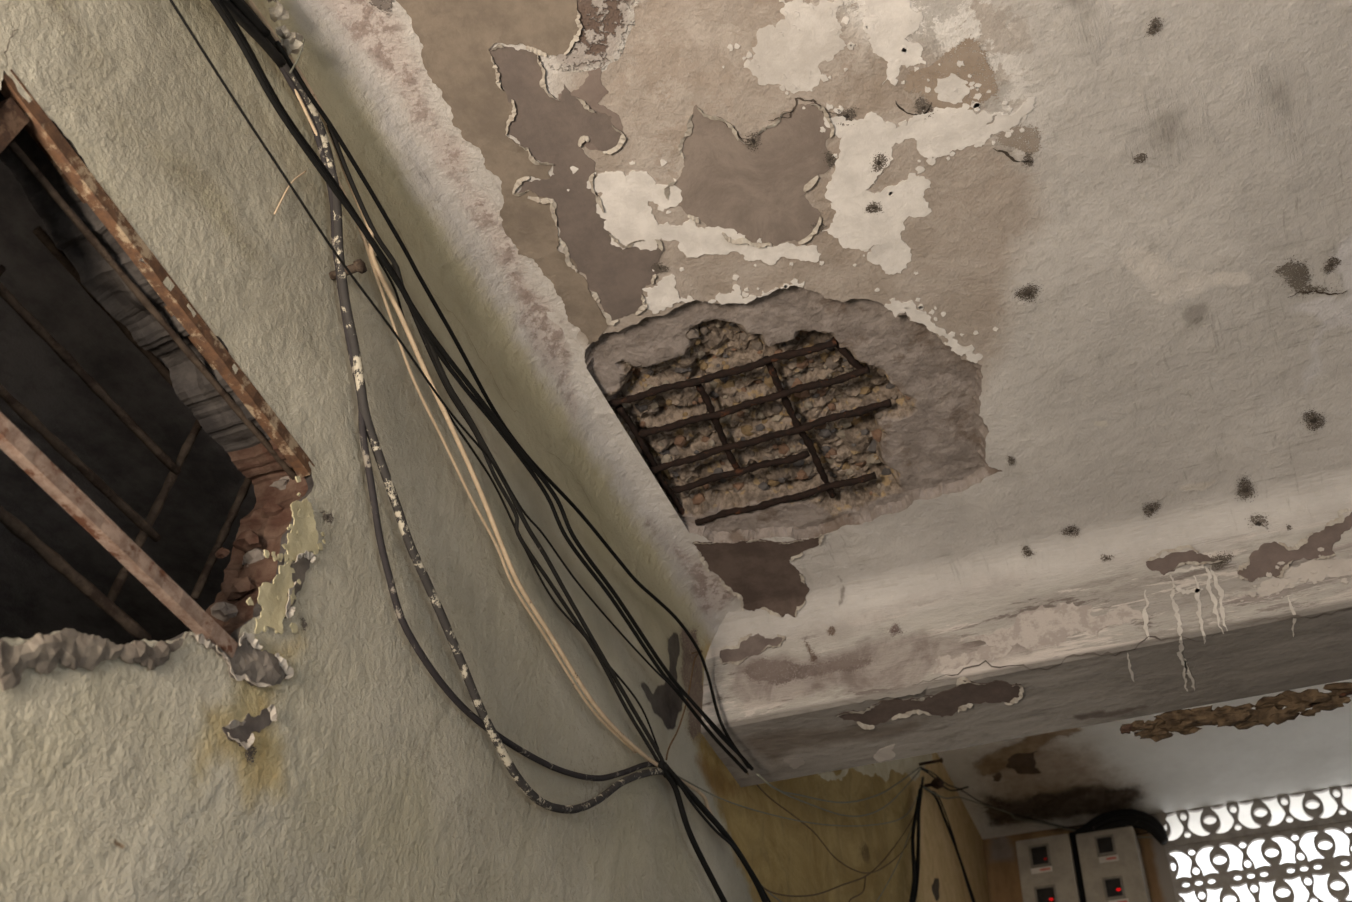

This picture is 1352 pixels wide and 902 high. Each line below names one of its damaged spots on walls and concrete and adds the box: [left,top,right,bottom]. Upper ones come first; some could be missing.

spalling [396,0,1035,618]
peeling [719,633,875,686]